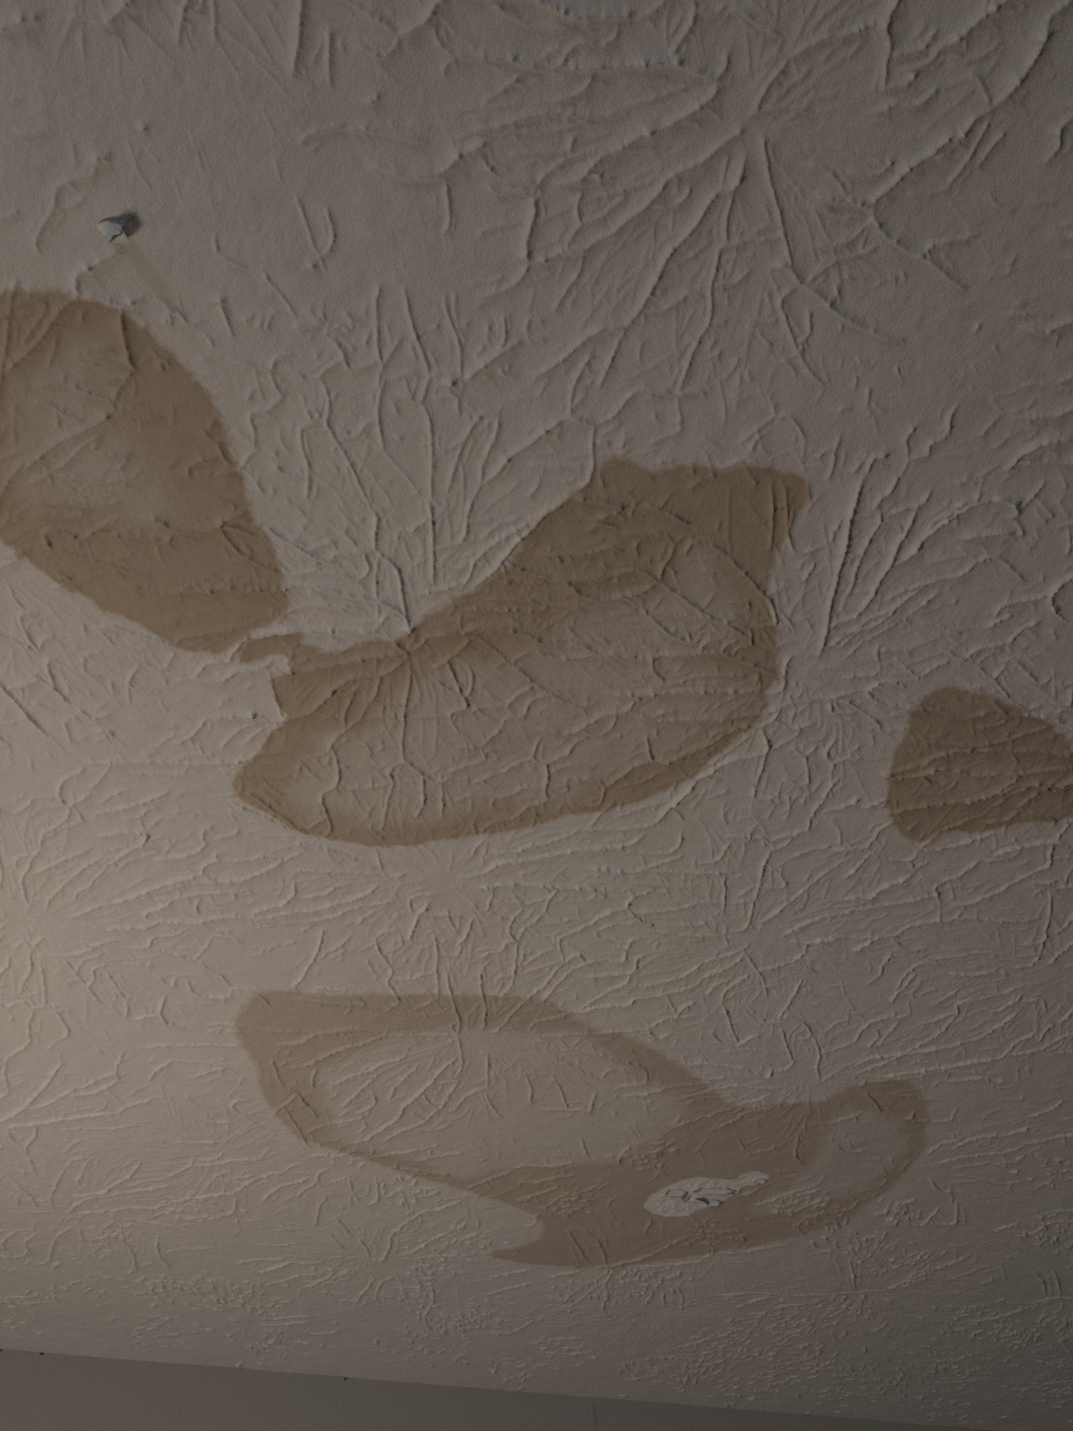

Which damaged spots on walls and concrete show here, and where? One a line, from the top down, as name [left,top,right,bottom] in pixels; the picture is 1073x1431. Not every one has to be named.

leakage [0,290,809,848]
leakage [885,687,1073,842]
leakage [234,991,927,1270]